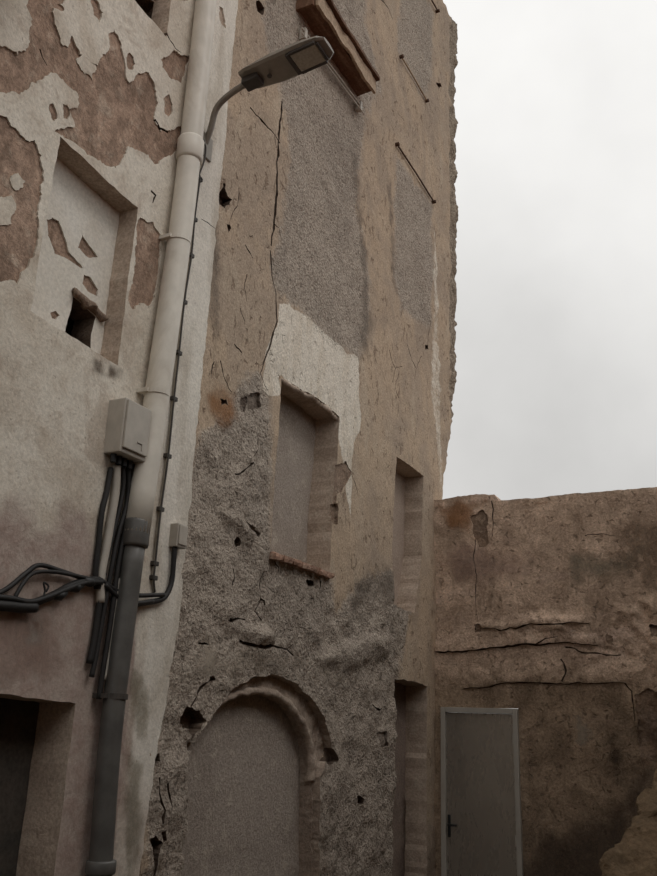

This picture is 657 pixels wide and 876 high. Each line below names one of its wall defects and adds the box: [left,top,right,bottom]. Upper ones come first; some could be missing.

peeling [0,0,181,167]
peeling [161,51,189,83]
peeling [0,116,108,322]
peeling [128,218,160,309]
crack [240,102,283,391]
crack [211,344,242,392]
spalling [328,461,352,525]
peeling [471,510,489,547]
crack [229,561,294,656]
crack [435,501,635,721]
spalling [180,706,206,750]